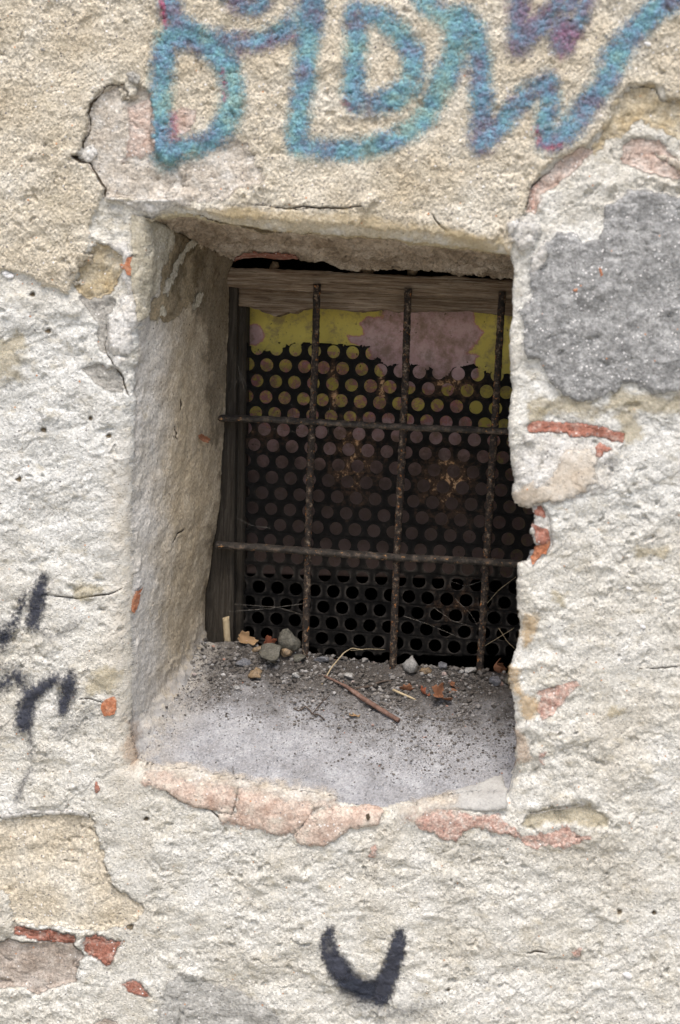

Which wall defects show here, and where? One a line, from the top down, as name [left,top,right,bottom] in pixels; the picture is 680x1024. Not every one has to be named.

crack [72,84,124,197]
spalling [75,71,265,206]
spalling [526,83,680,214]
crack [199,204,360,234]
flaking render [511,420,625,567]
flaking render [141,762,384,846]
flaking render [399,792,591,850]
spalling [0,810,144,995]
flaking render [122,980,150,997]